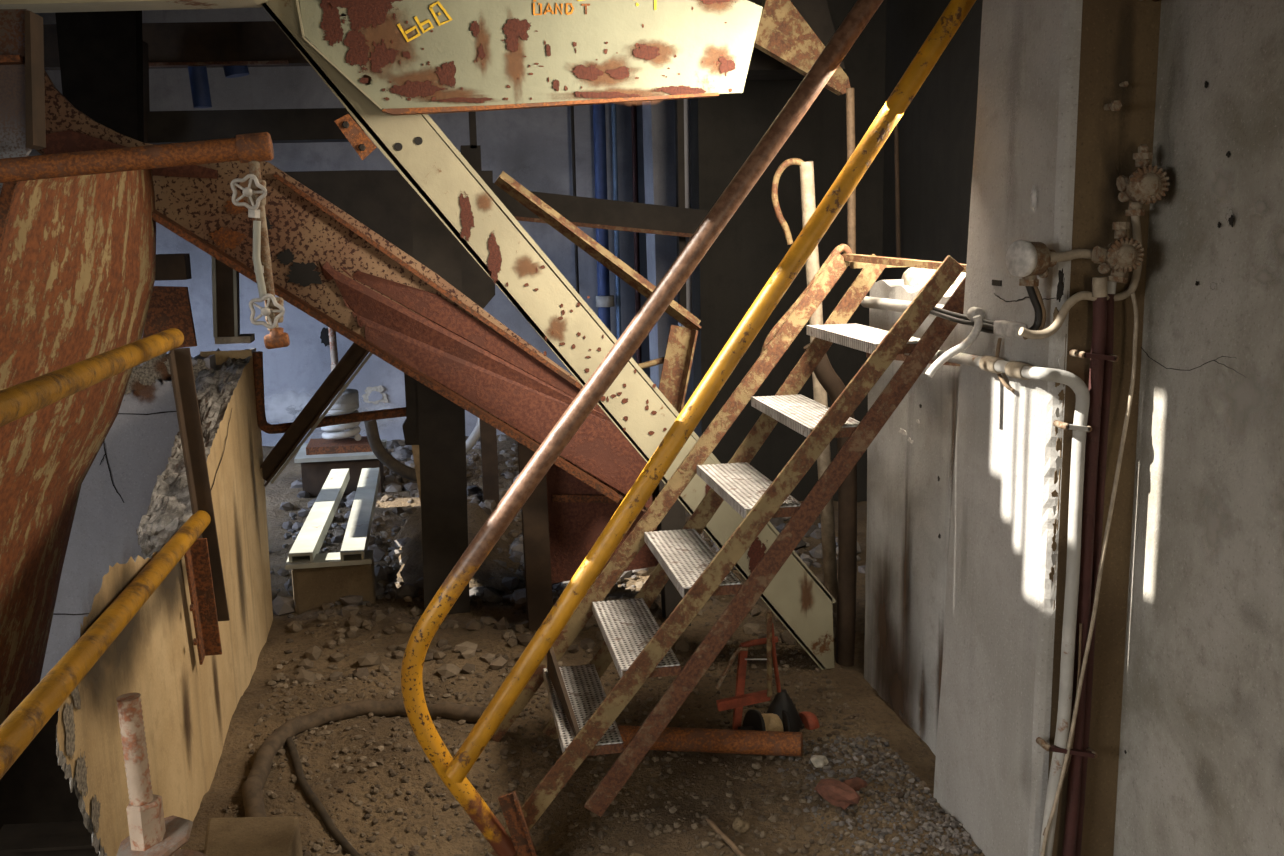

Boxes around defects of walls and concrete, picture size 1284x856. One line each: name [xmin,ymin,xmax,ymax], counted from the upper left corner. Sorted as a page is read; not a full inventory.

rust [320,0,706,103]
rust [702,55,736,92]
rust [459,192,491,242]
rust [486,232,545,291]
rust [532,296,604,373]
rust [601,369,636,441]
rust [747,537,768,573]
rust [801,576,812,611]
rust [875,493,943,739]